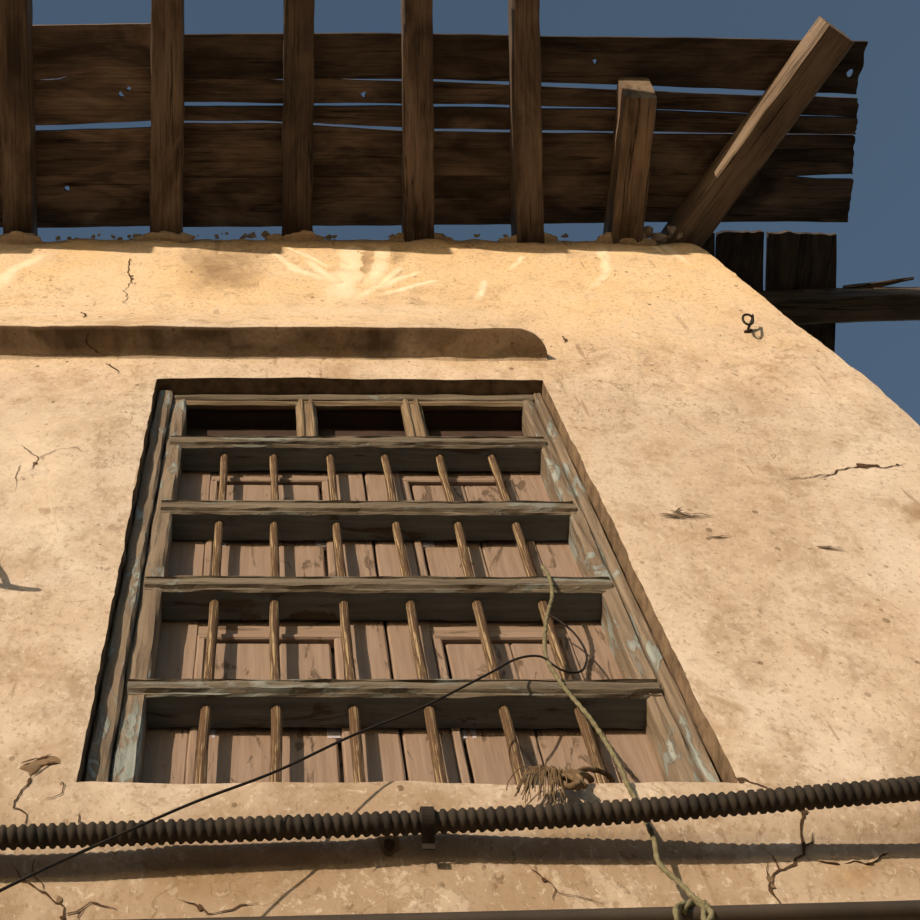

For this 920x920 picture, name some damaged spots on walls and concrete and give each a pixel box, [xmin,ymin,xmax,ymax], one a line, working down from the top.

crack [122,259,134,303]
crack [15,446,83,486]
crack [790,463,902,479]
peeling [19,754,61,776]
crack [13,777,64,825]
crack [766,810,814,904]
crack [14,857,118,920]
crack [178,899,256,917]